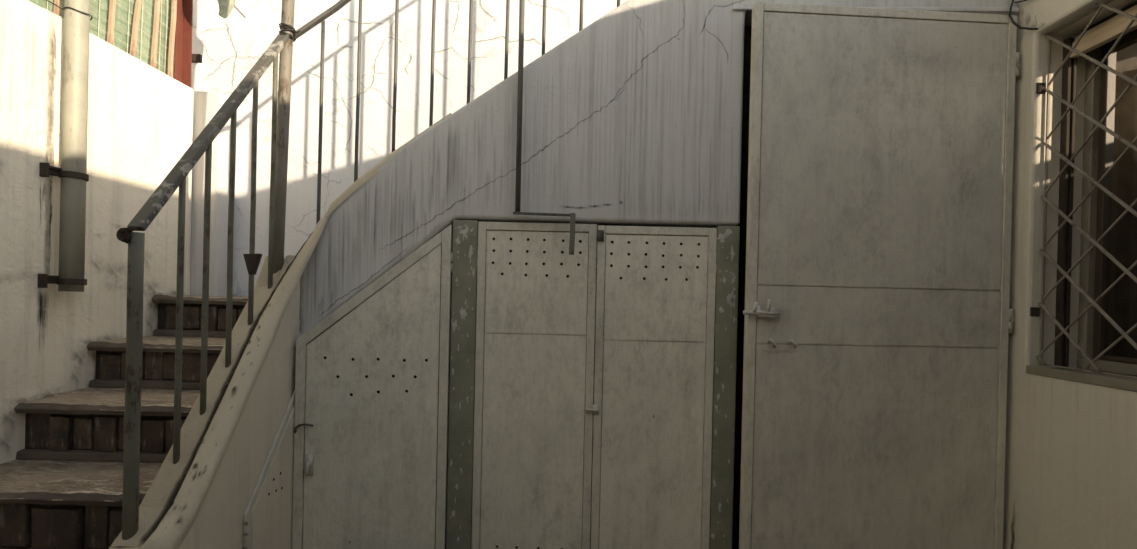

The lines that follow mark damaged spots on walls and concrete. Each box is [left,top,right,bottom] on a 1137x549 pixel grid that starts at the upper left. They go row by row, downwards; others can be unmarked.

peeling [452,225,475,351]
peeling [716,229,737,330]